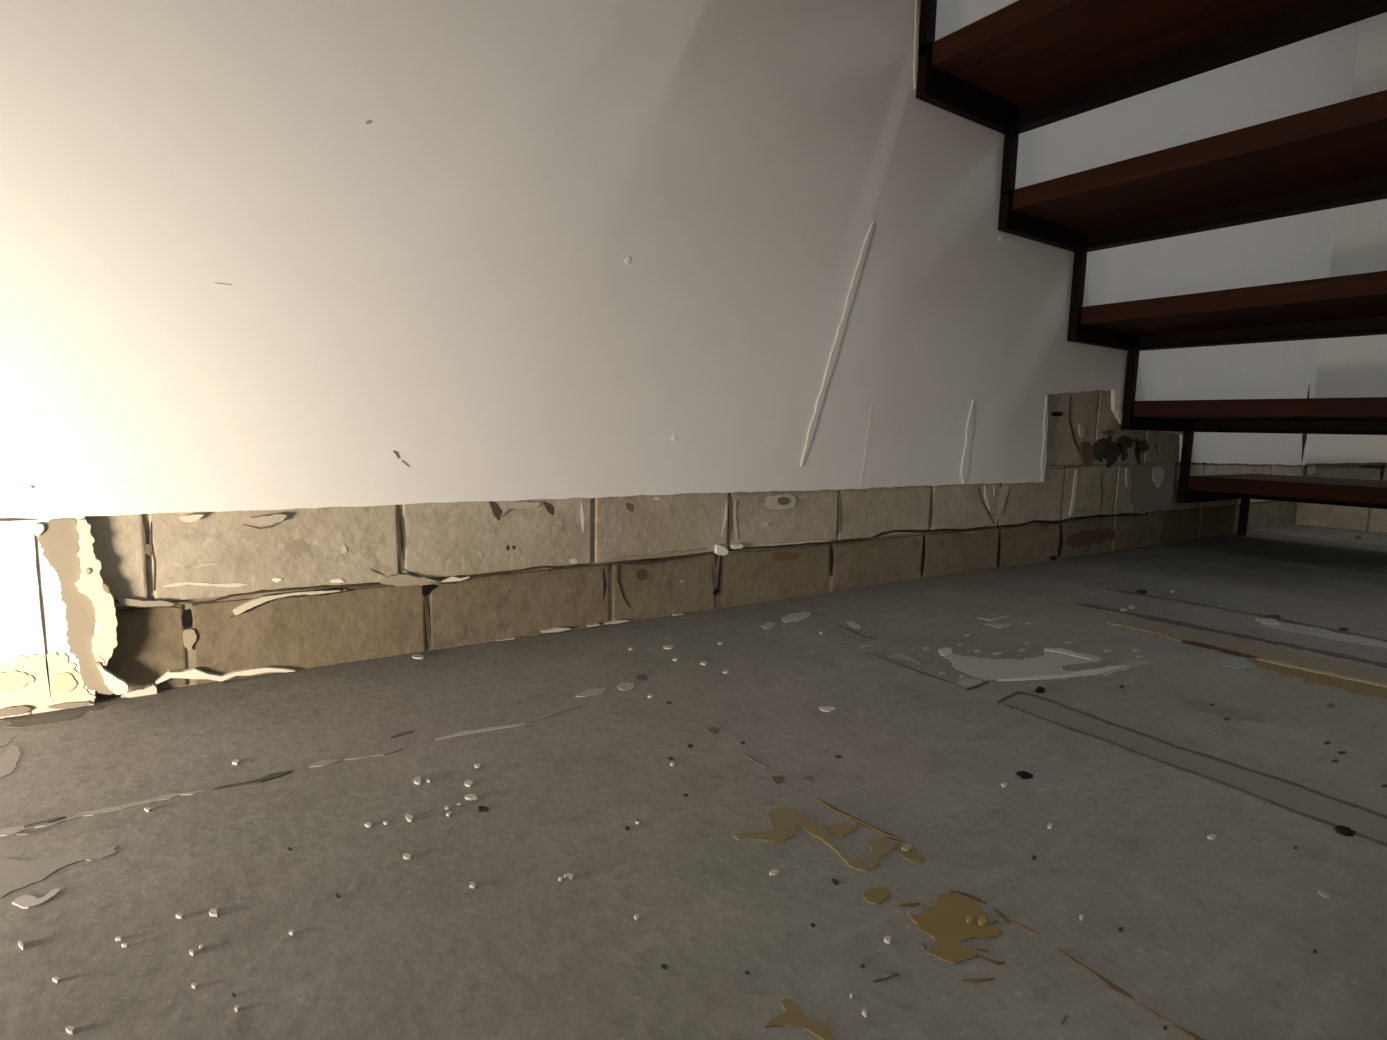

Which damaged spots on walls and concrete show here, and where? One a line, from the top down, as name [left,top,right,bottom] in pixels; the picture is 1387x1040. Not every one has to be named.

spalling [0,518,128,719]